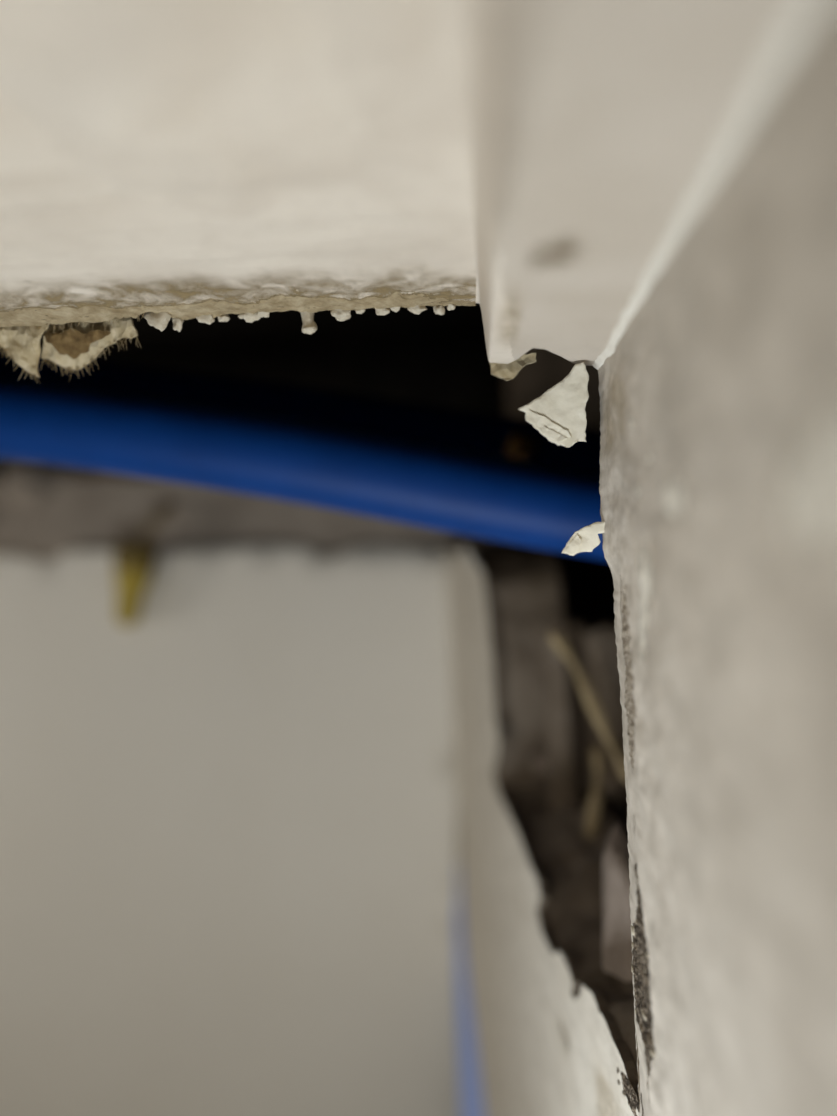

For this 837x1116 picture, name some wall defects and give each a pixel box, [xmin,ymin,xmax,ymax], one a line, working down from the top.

flaking render [144,312,269,332]
flaking render [331,304,456,321]
peeling [519,362,589,447]
flaking render [456,521,656,1103]